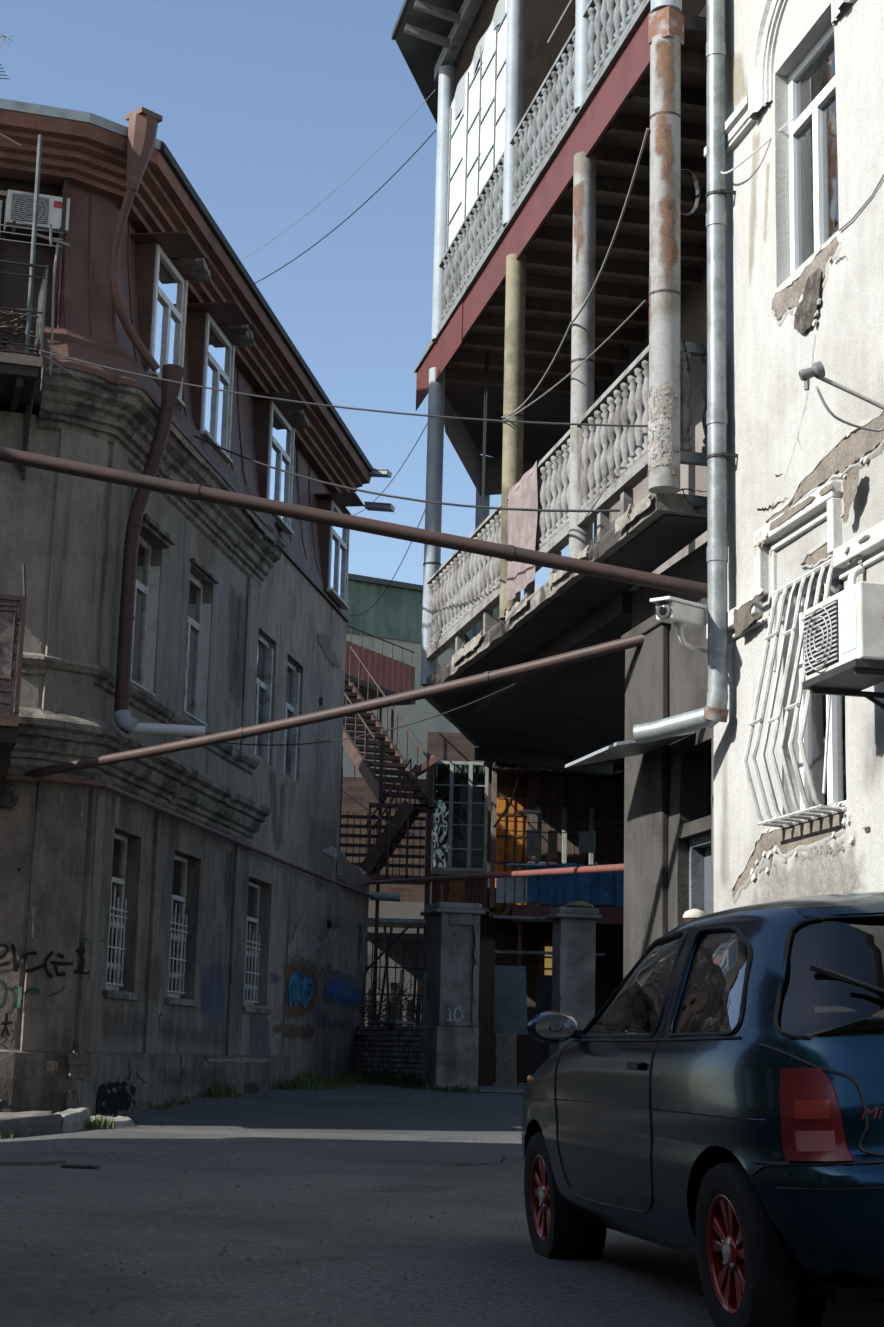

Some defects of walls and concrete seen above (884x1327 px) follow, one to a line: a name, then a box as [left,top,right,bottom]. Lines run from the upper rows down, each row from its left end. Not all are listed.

corrosion [655,40,679,304]
flaking render [771,231,842,334]
flaking render [756,410,884,547]
flaking render [800,534,870,570]
flaking render [731,800,870,904]